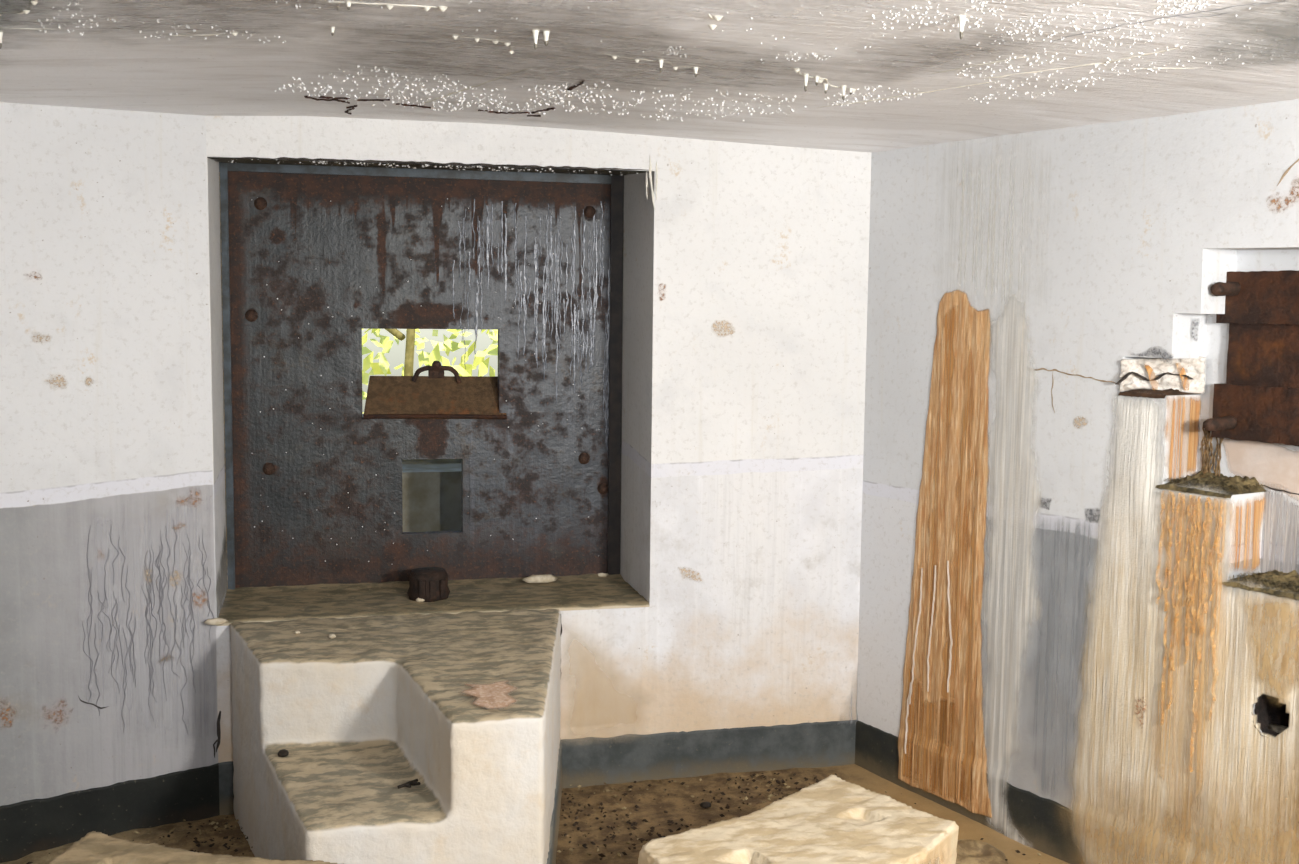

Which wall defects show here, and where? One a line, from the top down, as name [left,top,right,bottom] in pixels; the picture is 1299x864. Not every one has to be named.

leakage [385,13,779,85]
crack [1028,368,1116,413]
spalling [1115,348,1206,393]
corrosion [1167,397,1201,481]
corrosion [898,290,993,819]
leakage [984,297,1090,845]
corrosion [1136,496,1266,838]
corrosion [1248,603,1299,695]